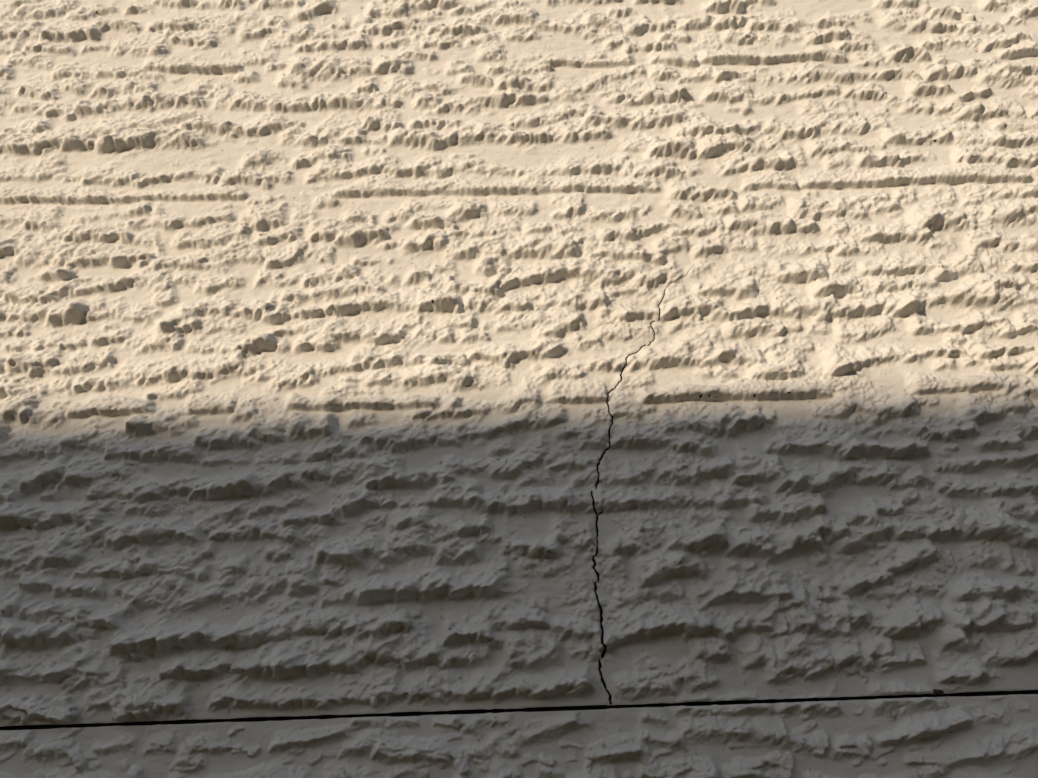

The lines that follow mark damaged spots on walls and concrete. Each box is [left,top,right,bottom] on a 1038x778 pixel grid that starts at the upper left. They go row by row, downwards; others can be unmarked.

crack [591,269,690,705]